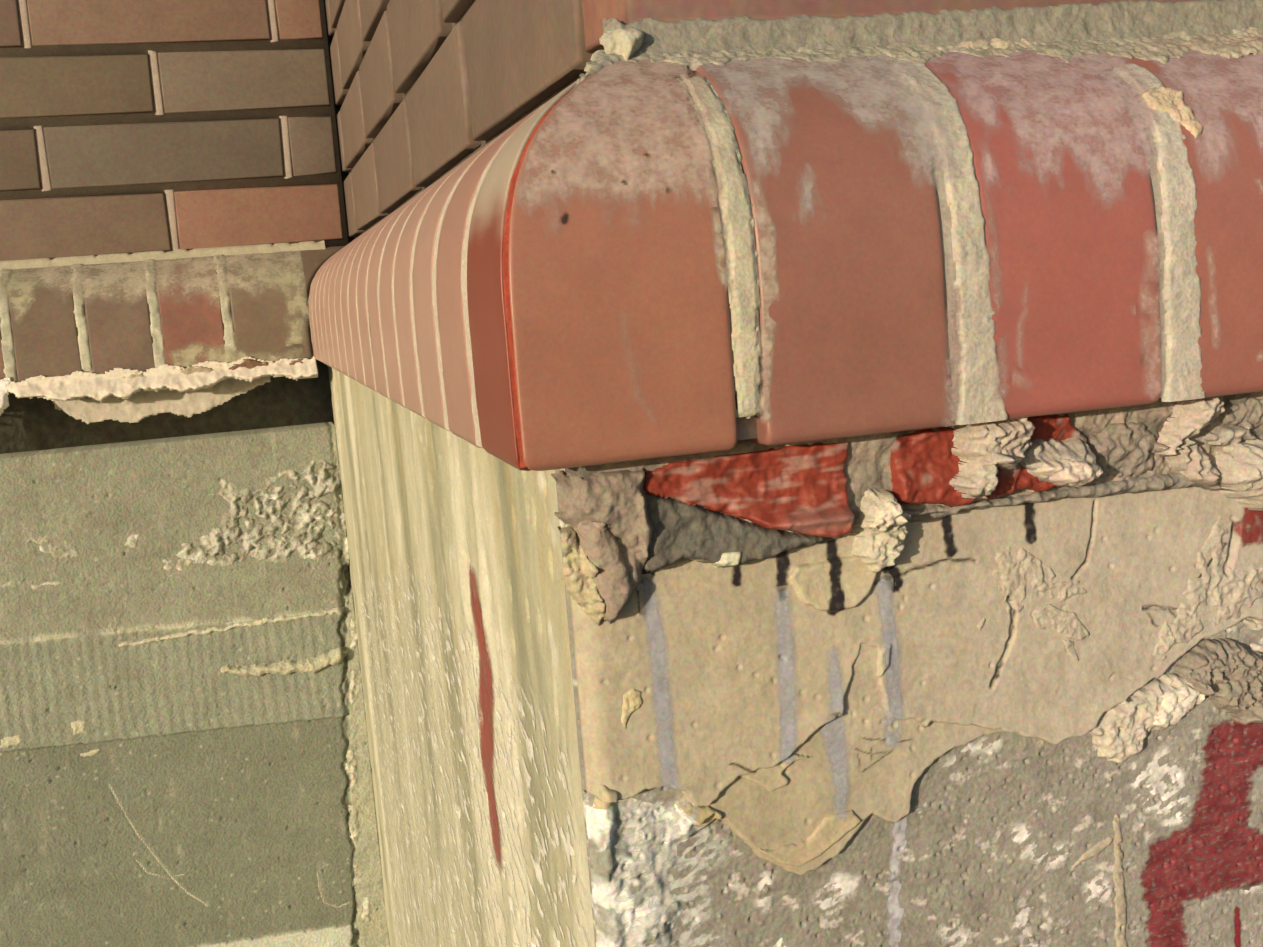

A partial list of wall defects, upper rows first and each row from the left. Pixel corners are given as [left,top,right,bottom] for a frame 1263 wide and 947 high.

water stain [1154,50,1263,174]
water stain [519,48,1154,423]
water stain [0,250,303,300]
peeling [0,356,318,416]
spalling [27,535,79,559]
spalling [124,534,140,549]
spalling [163,458,349,571]
spalling [349,668,362,704]
peeling [570,486,1263,876]
spalling [345,748,359,789]
spalling [348,805,361,842]
spalling [352,863,371,927]